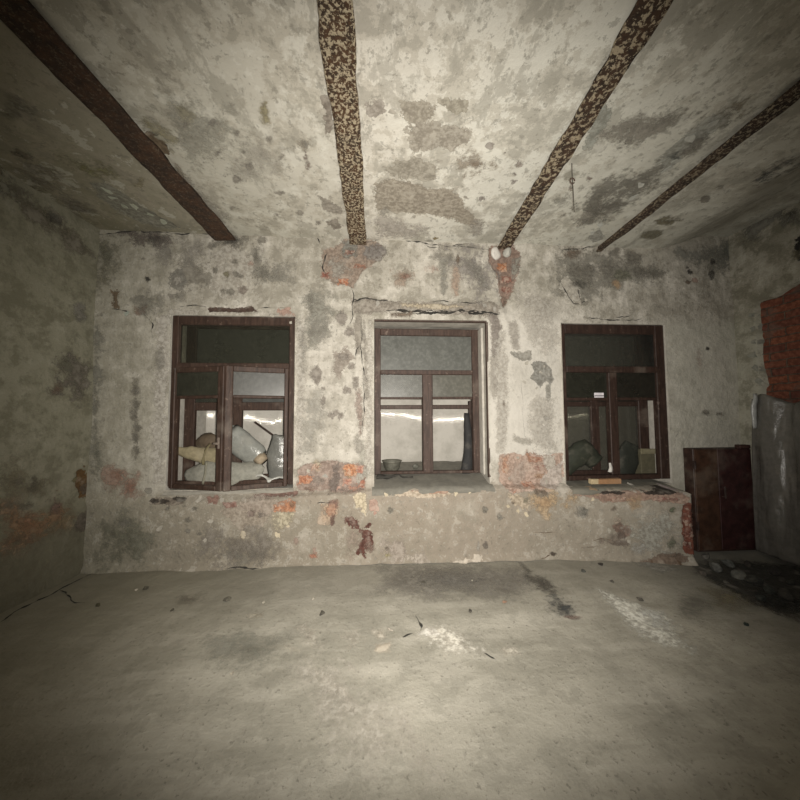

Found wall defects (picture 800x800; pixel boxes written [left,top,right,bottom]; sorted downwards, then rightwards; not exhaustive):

crack [350,285,367,431]
spalling [309,239,521,419]
peeling [511,350,554,402]
flaking render [747,284,800,403]
spalling [144,460,458,542]
corrosion [318,500,374,559]
spalling [498,452,565,517]
crack [1,574,90,622]